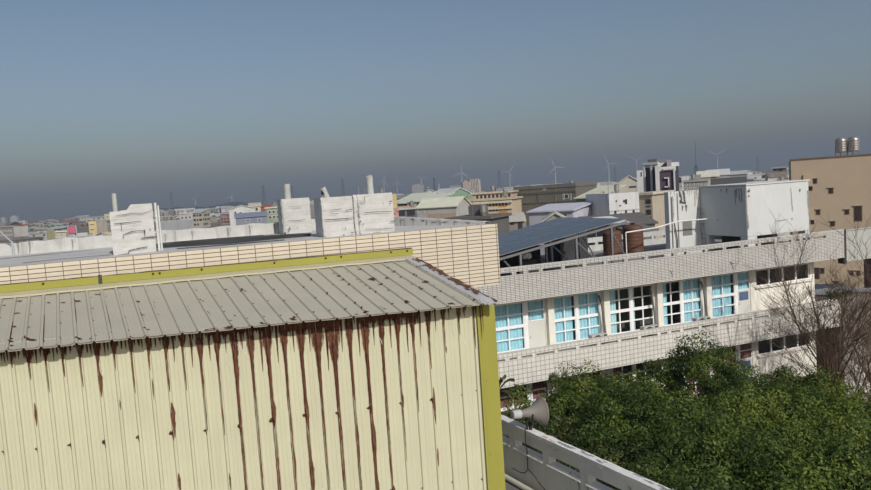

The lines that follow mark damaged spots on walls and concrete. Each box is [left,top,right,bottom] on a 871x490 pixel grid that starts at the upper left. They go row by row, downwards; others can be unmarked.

corrosion [0,258,484,490]